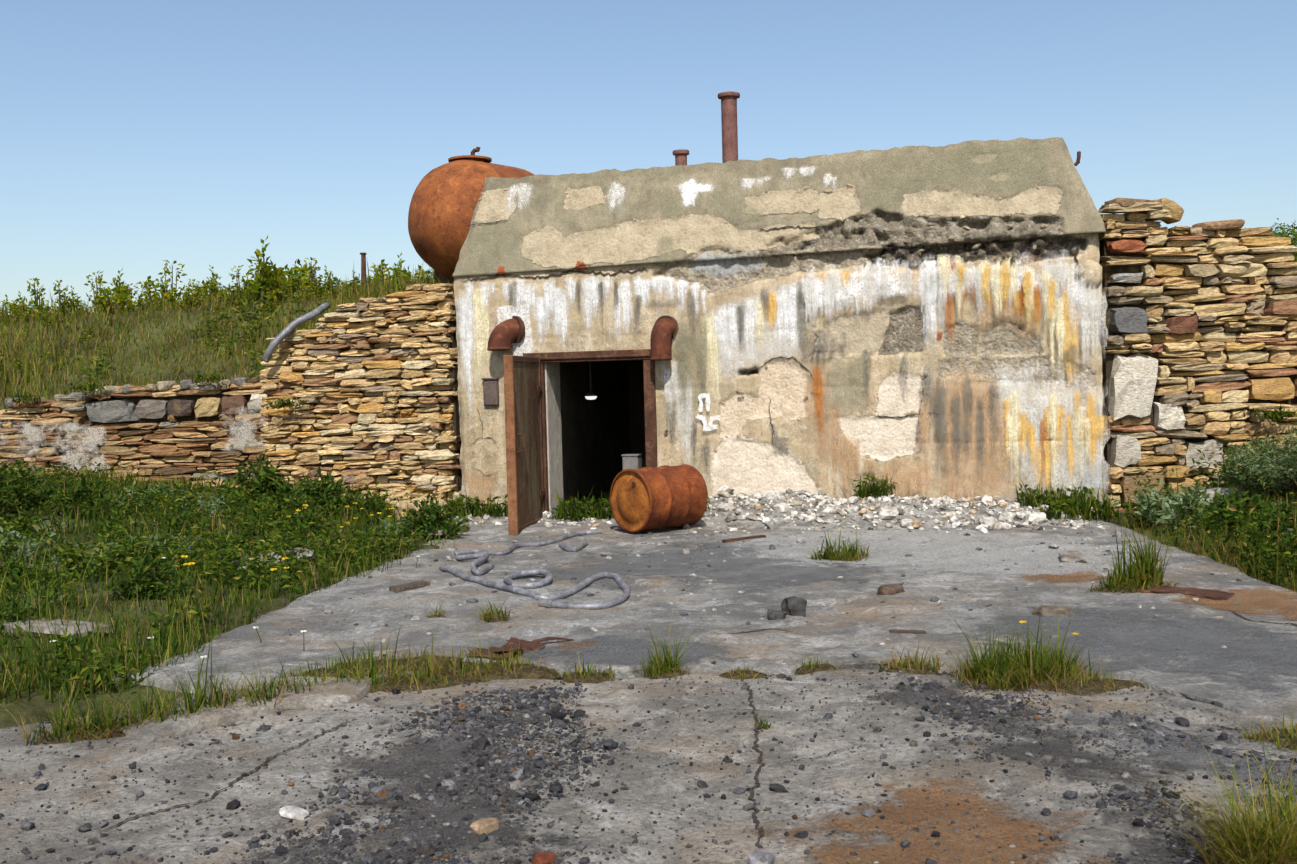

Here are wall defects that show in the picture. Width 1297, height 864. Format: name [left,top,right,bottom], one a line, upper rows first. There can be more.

peeling [521,153,1086,294]
leakage [456,221,1110,502]
peeling [710,305,928,497]
spalling [834,318,1098,490]
crack [744,682,845,849]